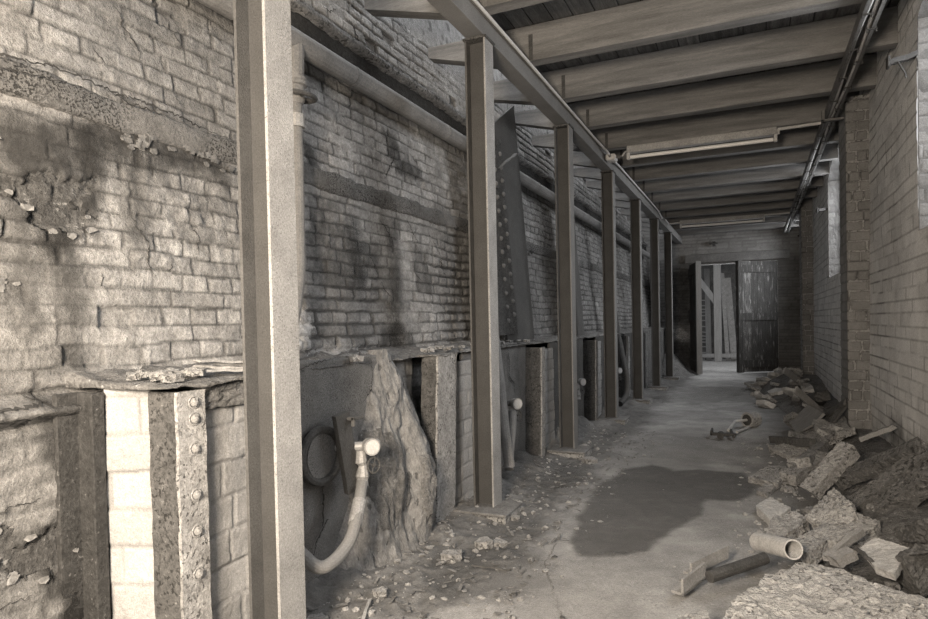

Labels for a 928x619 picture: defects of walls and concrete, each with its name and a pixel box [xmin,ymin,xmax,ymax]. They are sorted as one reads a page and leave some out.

crack [110,2,141,59]
crack [0,43,228,138]
water stain [0,115,225,220]
peeling [120,132,235,174]
spalling [0,170,98,240]
peeling [0,278,21,292]
water stain [42,228,78,286]
spalling [0,525,58,586]